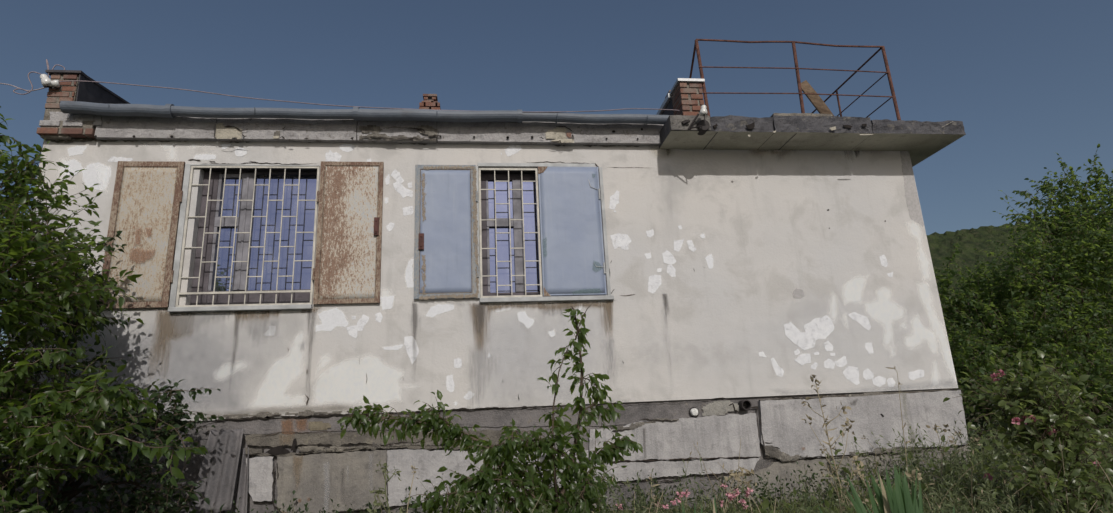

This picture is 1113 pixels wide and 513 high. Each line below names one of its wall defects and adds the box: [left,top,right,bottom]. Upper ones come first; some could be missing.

spalling [325,125,441,162]
rust [130,227,155,263]
peeling [610,233,631,250]
peeling [644,225,713,294]
peeling [315,295,395,338]
peeling [383,336,419,364]
peeling [759,351,784,377]
peeling [784,312,924,398]